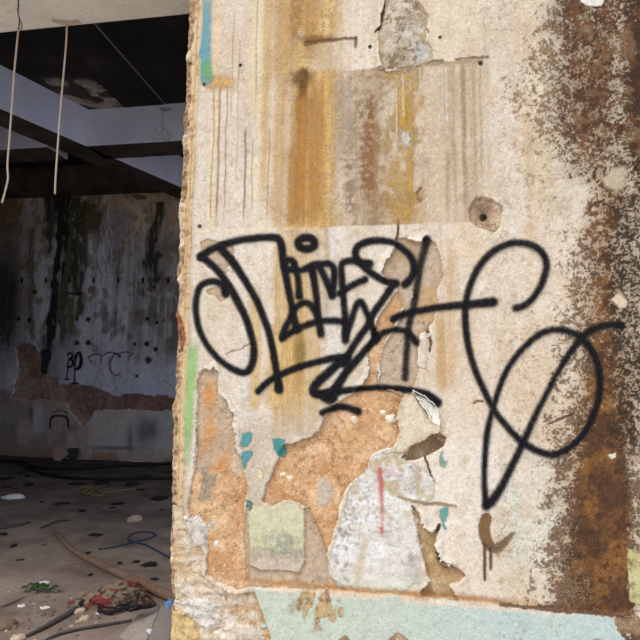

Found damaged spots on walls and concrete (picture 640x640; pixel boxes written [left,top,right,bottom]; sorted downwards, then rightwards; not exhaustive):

rust [261,0,341,228]
water stain [0,199,23,228]
water stain [27,196,113,374]
water stain [142,202,164,289]
spalling [468,197,502,233]
flaking render [12,340,175,425]
flaking render [171,228,465,640]
rust [527,175,637,615]